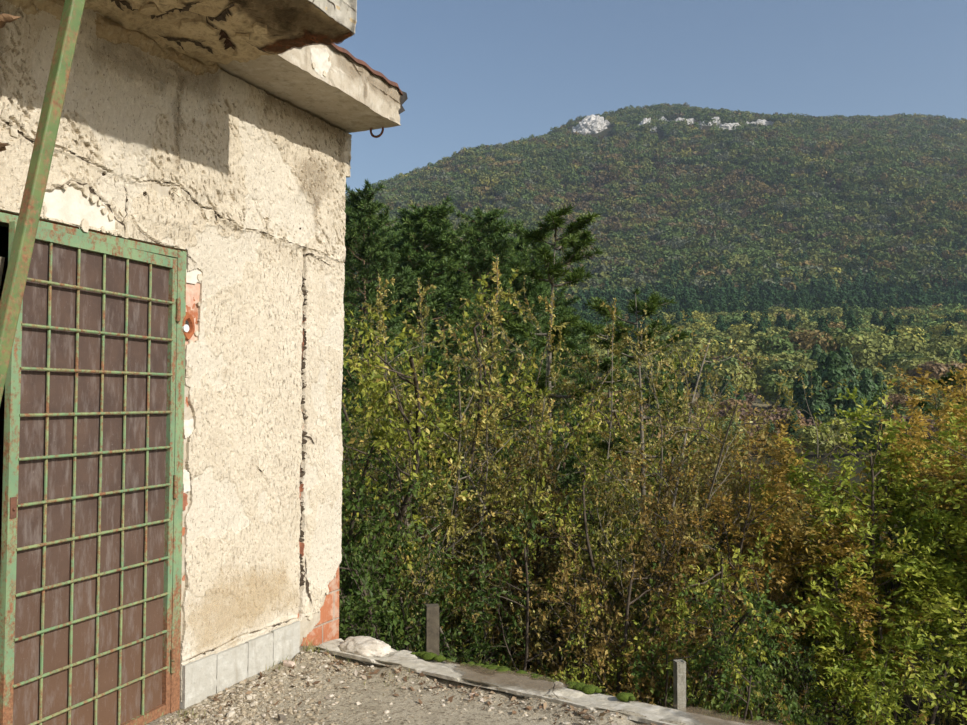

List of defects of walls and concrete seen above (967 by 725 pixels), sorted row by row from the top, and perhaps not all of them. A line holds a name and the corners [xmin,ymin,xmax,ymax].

crack [111,0,276,54]
peeling [44,184,115,233]
spalling [182,269,203,345]
crack [3,121,338,603]
crack [184,620,290,662]
spalling [297,565,339,647]